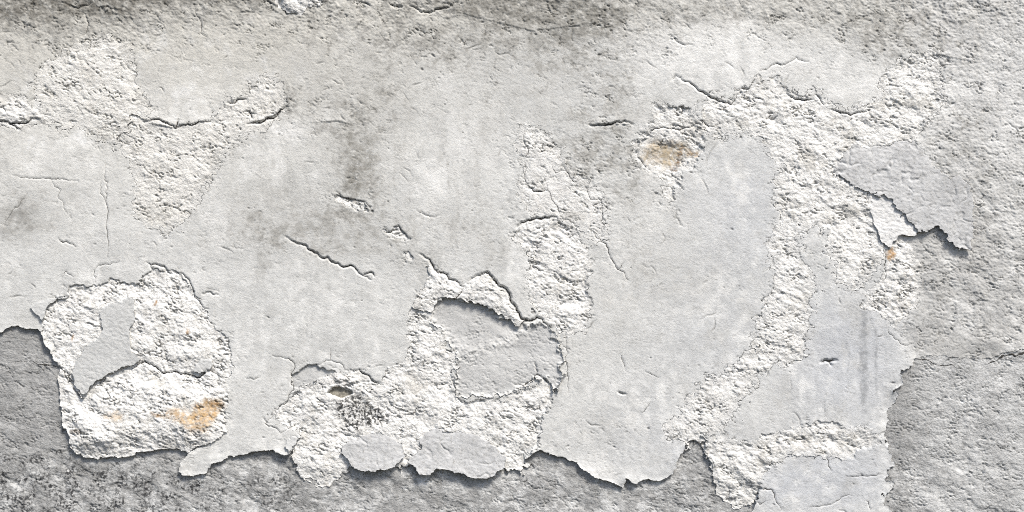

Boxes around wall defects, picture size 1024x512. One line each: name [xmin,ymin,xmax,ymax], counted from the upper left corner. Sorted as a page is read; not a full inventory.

spalling [0,32,290,236]
crack [593,57,809,166]
crack [788,95,867,116]
spalling [0,267,234,394]
crack [291,240,374,280]
spalling [178,48,975,510]
rust [157,401,219,429]